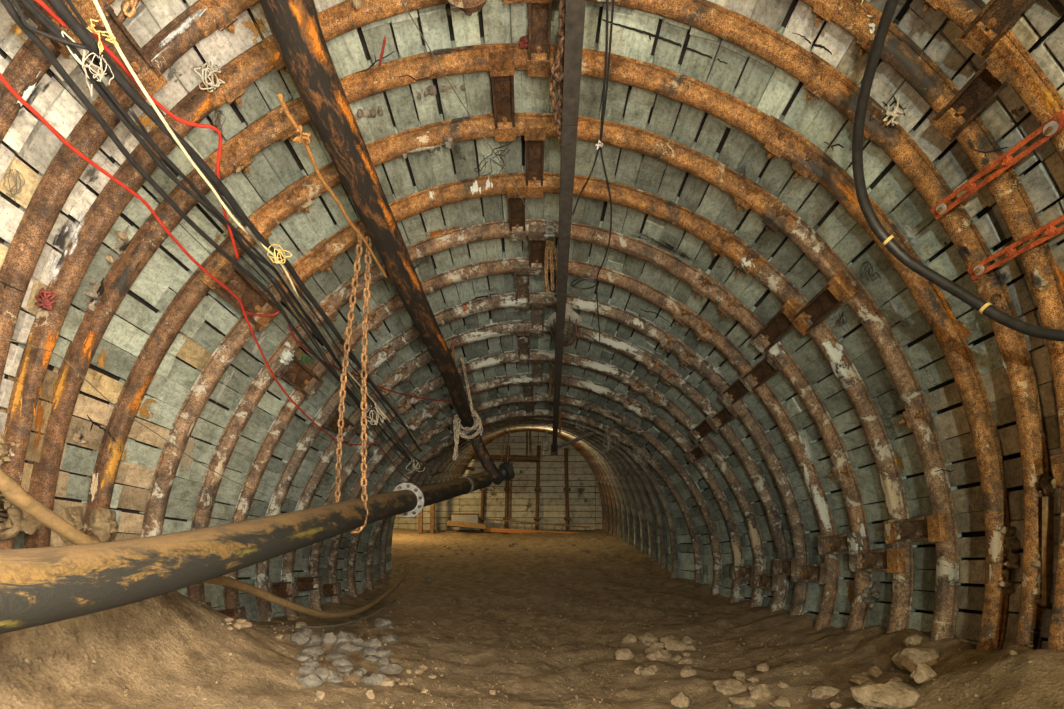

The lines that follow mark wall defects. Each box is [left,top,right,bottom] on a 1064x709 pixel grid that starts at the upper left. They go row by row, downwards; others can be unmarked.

rust [244,20,280,69]
rust [290,3,325,61]
rust [337,91,357,131]
rust [358,146,379,183]
rust [379,201,395,231]
rust [837,181,860,207]
rust [404,262,421,292]
rust [43,332,59,366]
rust [82,332,112,381]
rust [11,346,66,448]
rust [127,373,156,419]
rust [100,440,126,489]